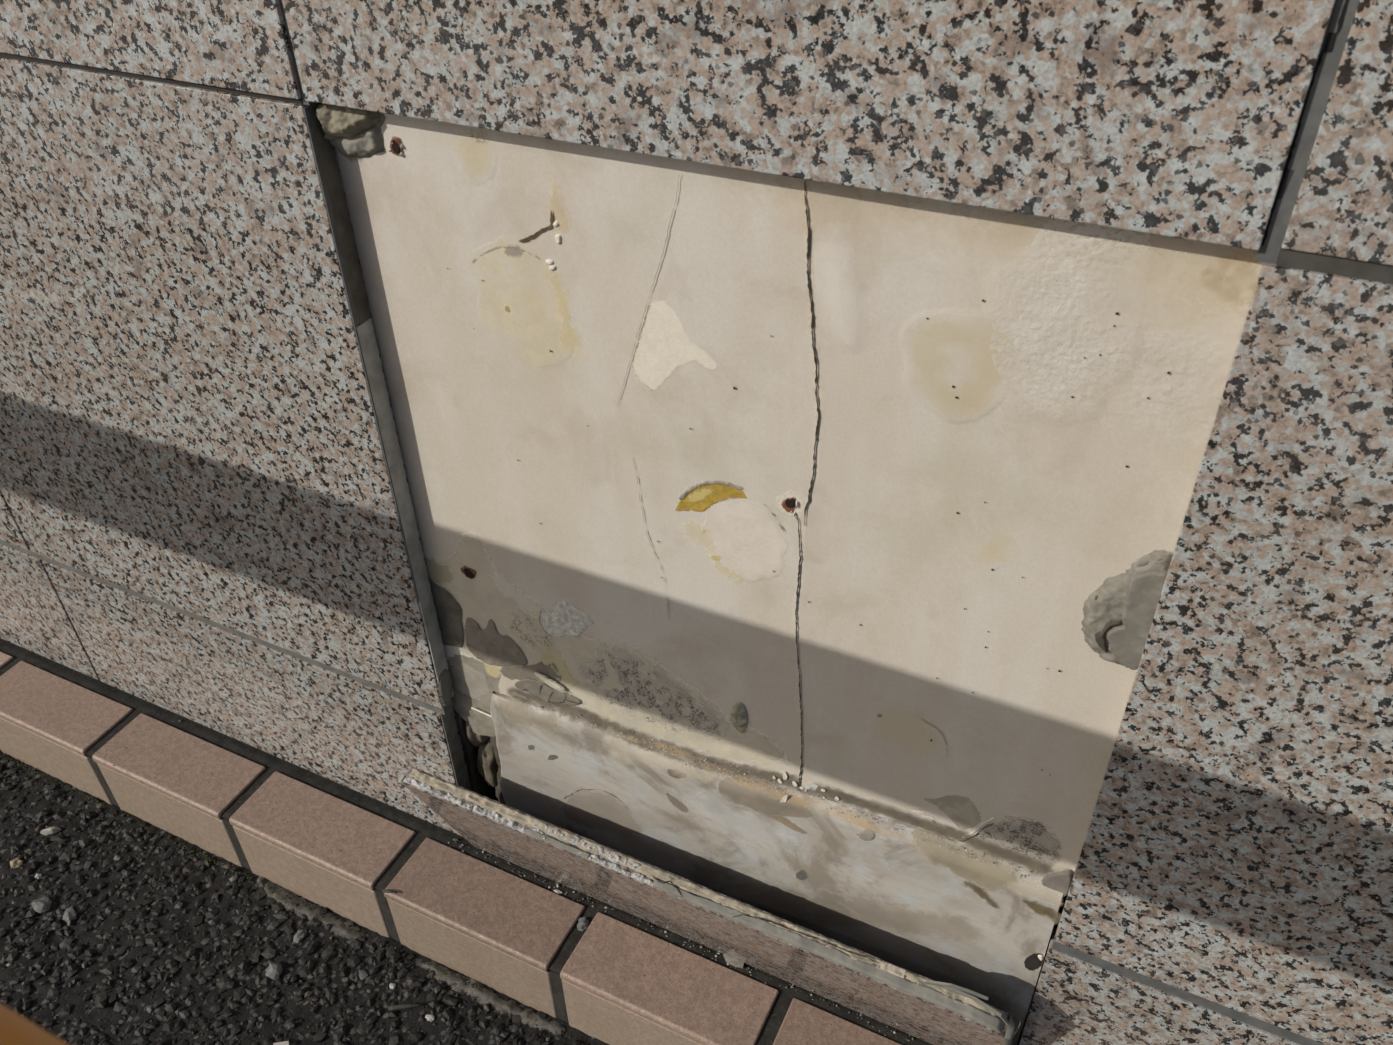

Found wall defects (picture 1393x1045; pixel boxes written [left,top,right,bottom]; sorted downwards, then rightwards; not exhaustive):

crack [618,174,681,399]
peeling [630,300,717,391]
spalling [675,480,747,512]
crack [764,182,819,789]
peeling [426,532,839,834]